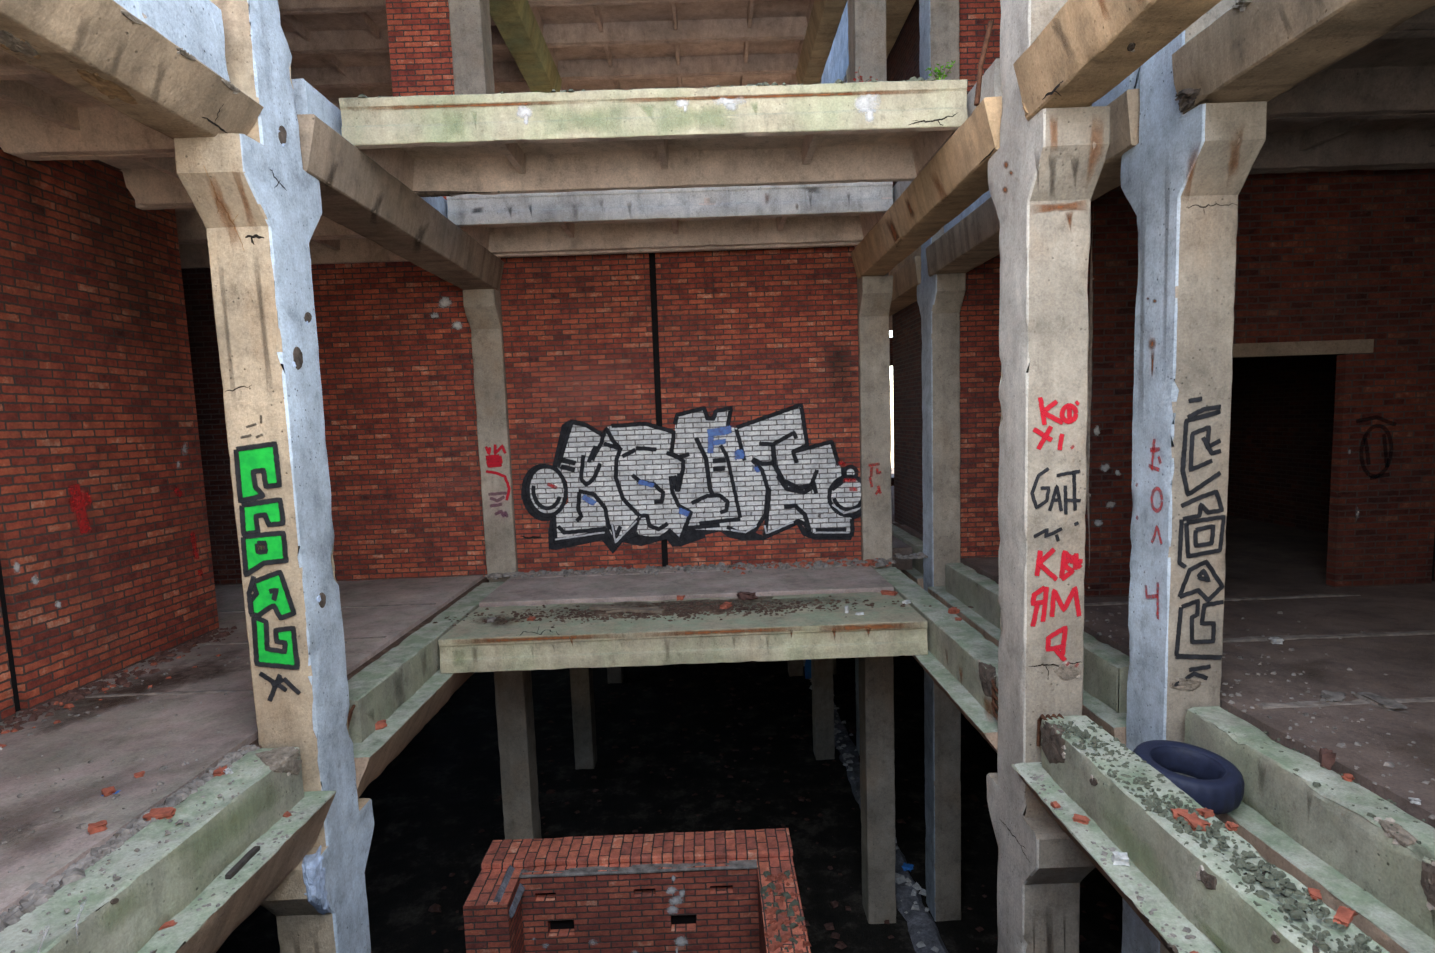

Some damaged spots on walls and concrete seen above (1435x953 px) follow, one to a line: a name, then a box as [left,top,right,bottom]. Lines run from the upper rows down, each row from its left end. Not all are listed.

leakage [518,106,531,124]
leakage [720,98,738,110]
leakage [856,94,876,121]
spalling [1036,713,1066,764]
peeling [302,845,330,915]